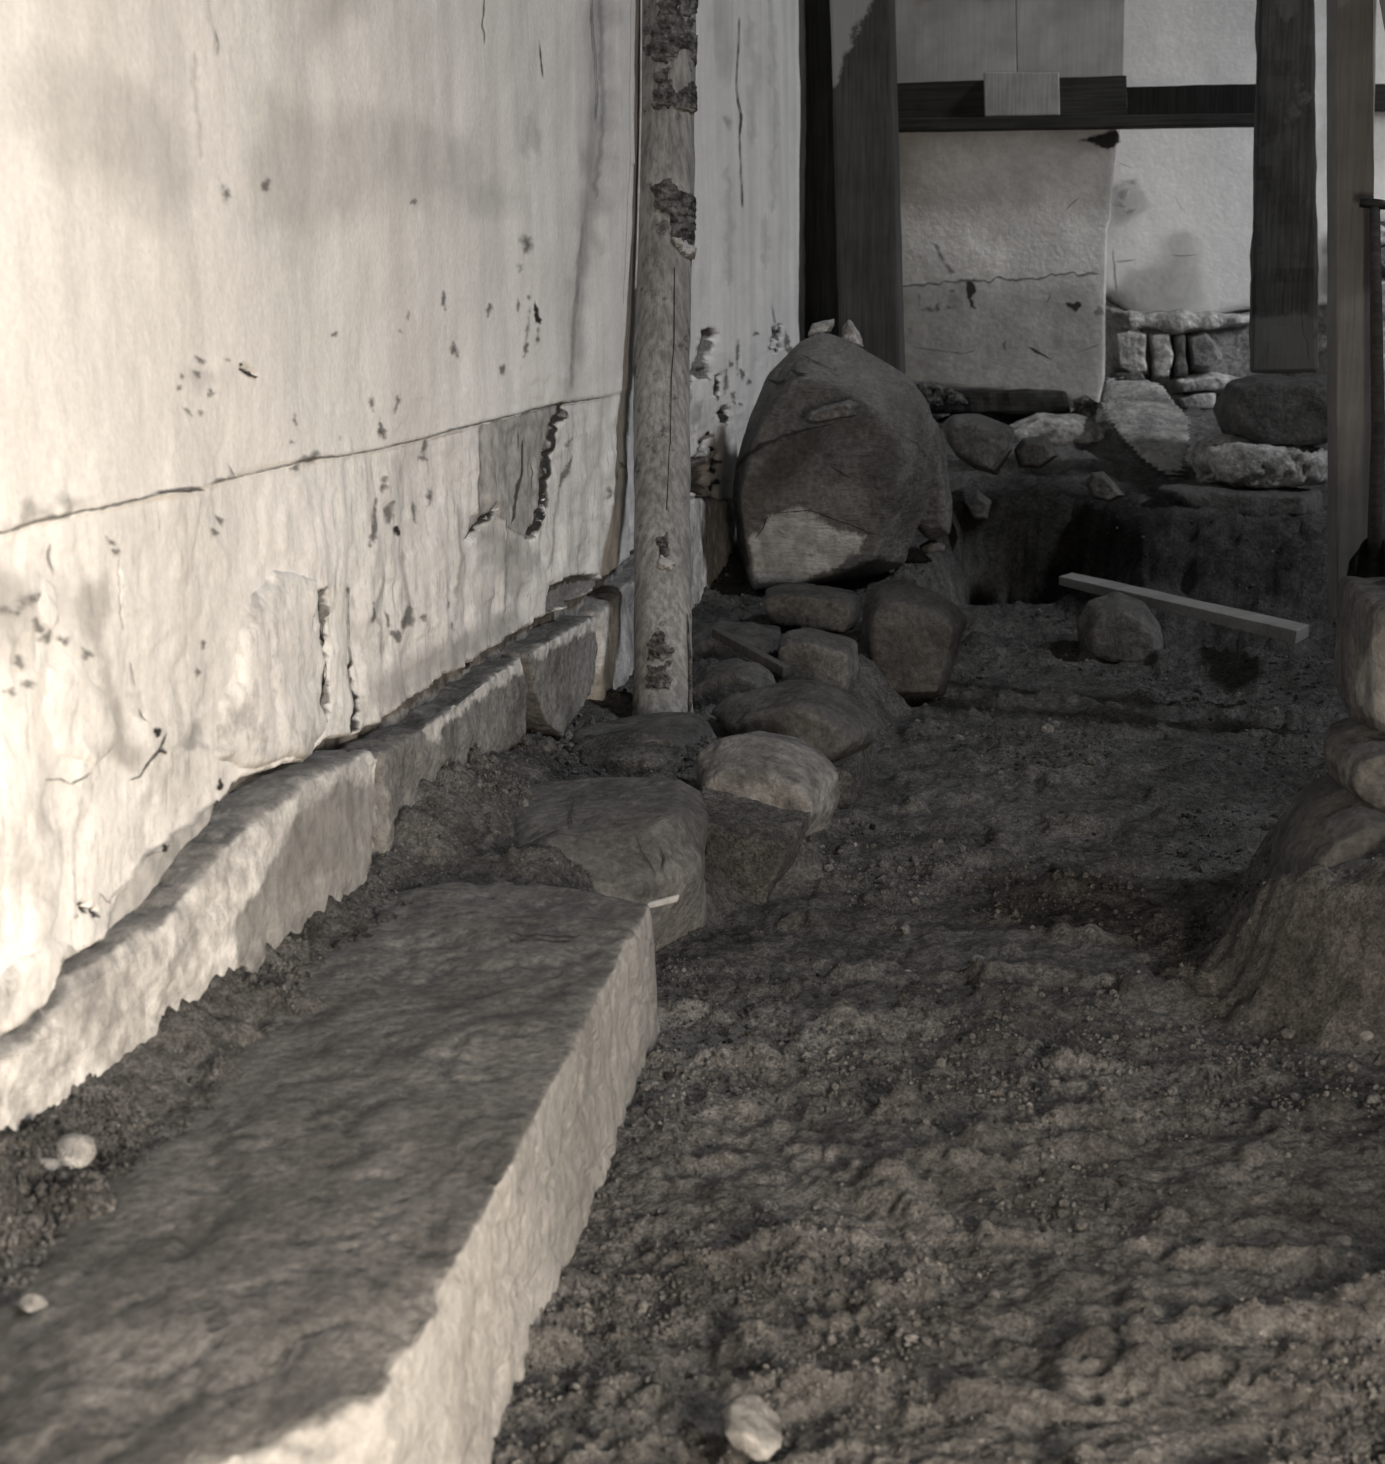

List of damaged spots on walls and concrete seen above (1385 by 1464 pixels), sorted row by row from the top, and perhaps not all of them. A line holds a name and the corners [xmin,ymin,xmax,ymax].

crack [903,254,1132,311]
crack [0,397,603,534]
flaking render [465,404,572,539]
spalling [372,603,426,642]